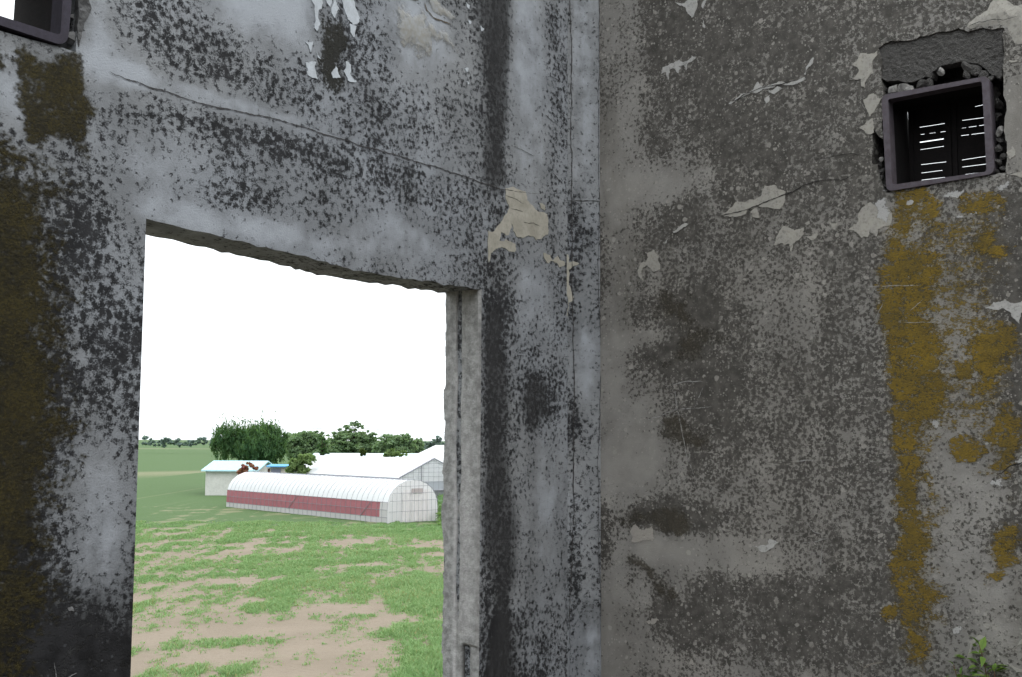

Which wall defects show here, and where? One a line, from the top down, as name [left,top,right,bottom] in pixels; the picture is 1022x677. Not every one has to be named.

water stain [0,43,97,159]
peeling [305,42,321,79]
crack [111,72,537,194]
peeling [311,0,360,38]
peeling [331,61,356,83]
spalling [850,28,1022,193]
spalling [487,187,549,263]
peeling [722,185,786,218]
crack [514,1,601,664]
peeling [986,301,1022,324]
water stain [870,181,1022,634]
water stain [486,307,515,677]